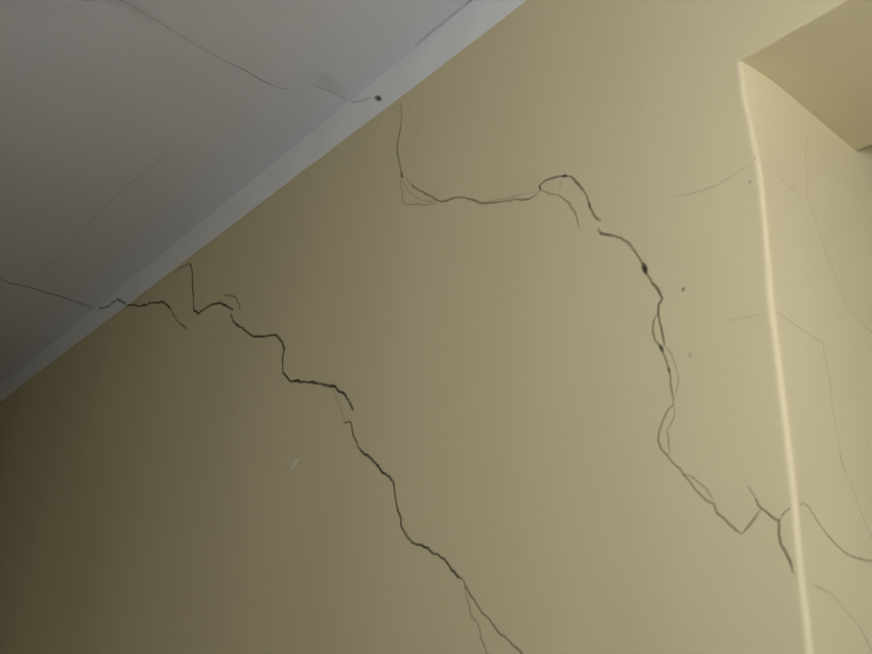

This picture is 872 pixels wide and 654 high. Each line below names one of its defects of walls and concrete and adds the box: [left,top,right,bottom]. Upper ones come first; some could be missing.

crack [100,299,171,310]
crack [190,265,351,406]
crack [352,431,394,485]
crack [414,543,459,577]